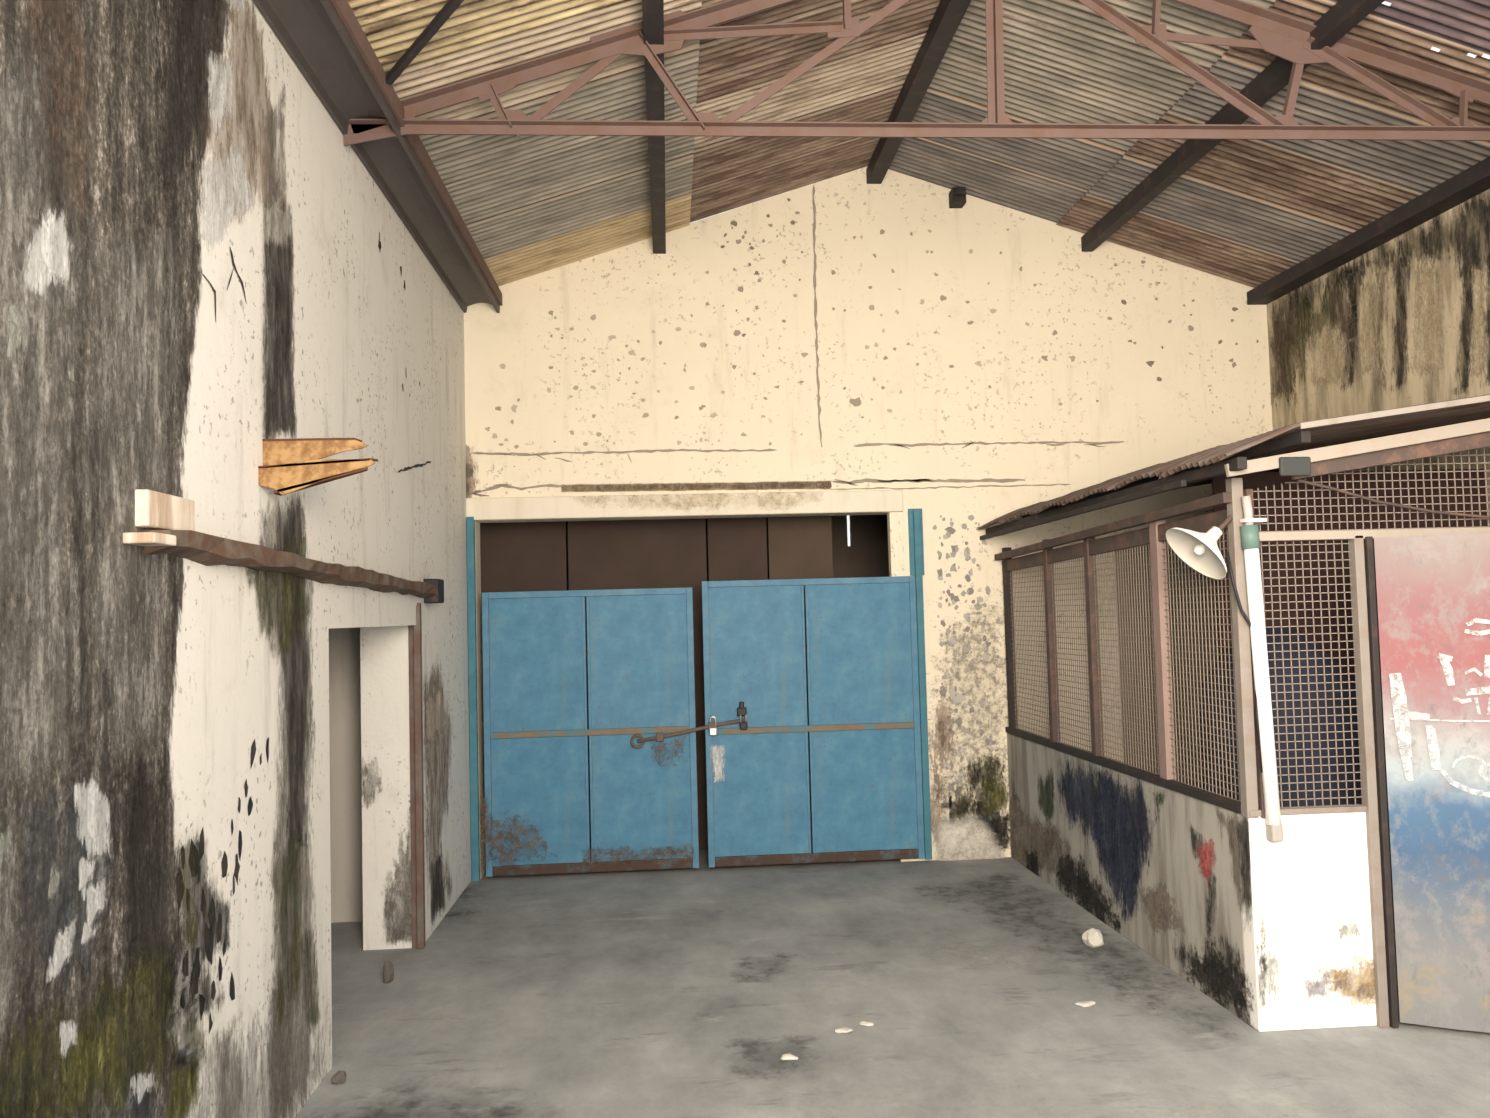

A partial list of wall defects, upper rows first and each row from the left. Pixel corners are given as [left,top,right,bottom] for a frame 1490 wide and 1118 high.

leakage [1271,193,1490,405]
leakage [0,0,331,1118]
leakage [930,602,1071,873]
peeling [49,777,110,980]
leakage [383,834,412,943]
corrosion [480,796,555,872]
corrosion [584,846,694,865]
leakage [1141,883,1279,1028]
peeling [60,1021,76,1053]
peeling [132,1073,154,1103]